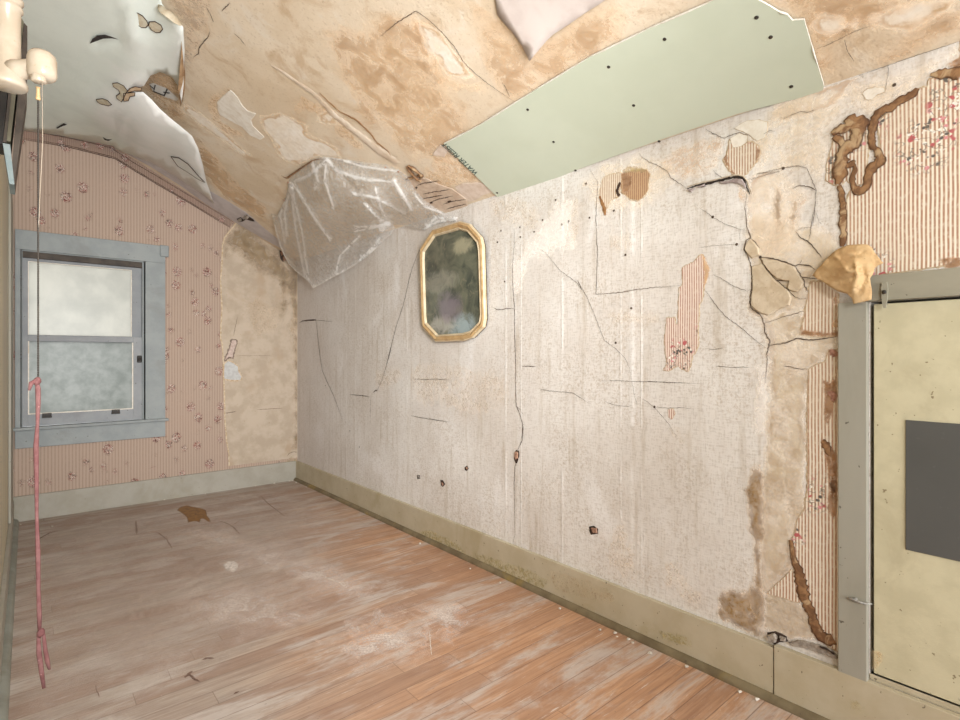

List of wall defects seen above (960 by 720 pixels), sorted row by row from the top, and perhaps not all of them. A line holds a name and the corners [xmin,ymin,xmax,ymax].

peeling [217,90,339,164]
leakage [336,21,460,152]
leakage [535,23,611,71]
leakage [610,164,647,201]
peeling [220,215,297,466]
crack [301,254,418,415]
crack [496,243,536,541]
crack [544,175,688,434]
crack [640,155,833,382]
leakage [719,173,838,638]
peeling [745,239,883,315]
spalling [767,631,838,659]